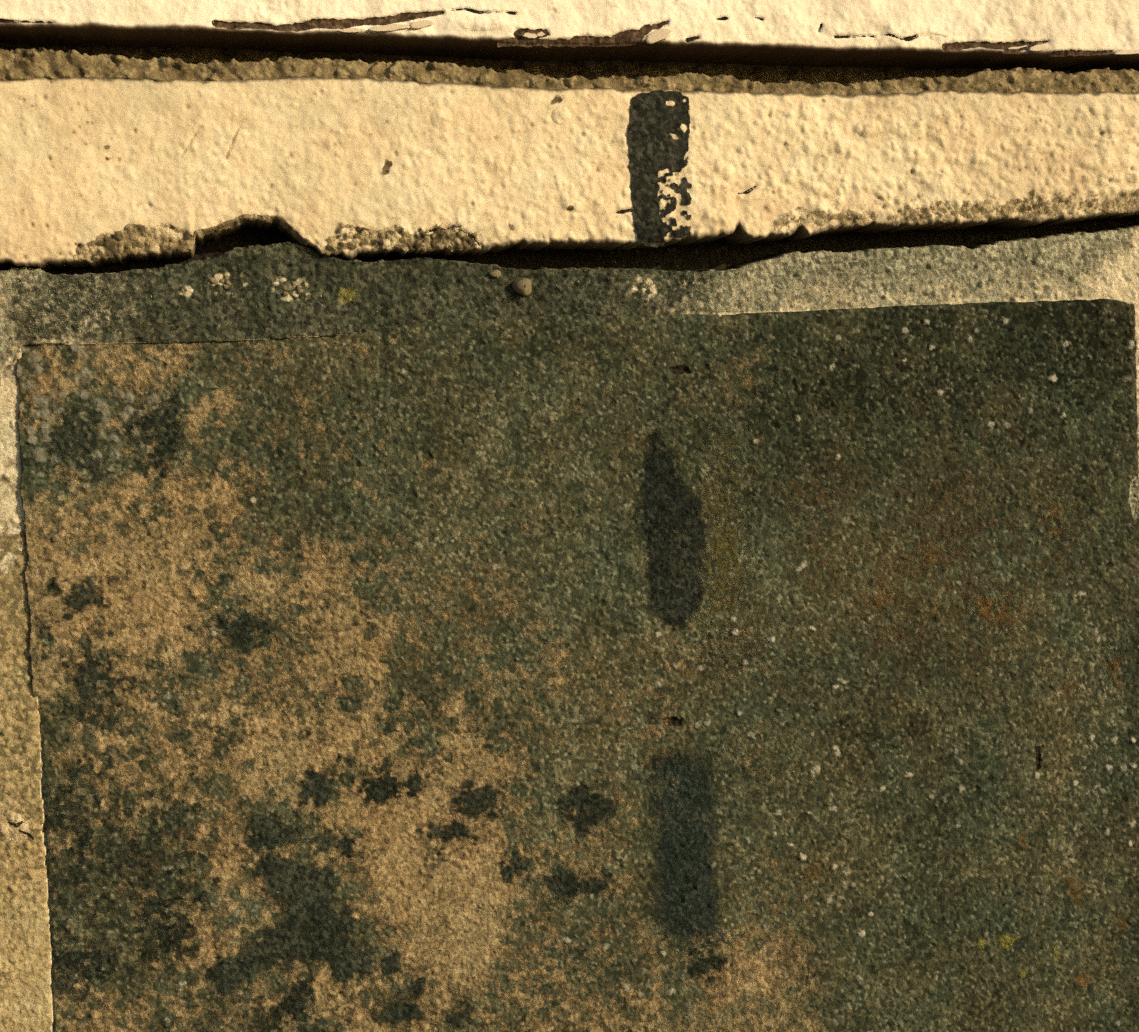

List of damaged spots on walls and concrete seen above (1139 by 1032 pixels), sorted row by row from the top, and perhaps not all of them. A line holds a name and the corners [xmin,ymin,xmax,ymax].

crack [0,16,53,24]
peeling [212,11,444,33]
peeling [497,20,674,48]
crack [686,16,728,42]
crack [818,24,945,41]
crack [615,207,633,215]
crack [0,227,292,275]
spalling [74,214,478,263]
crack [328,225,484,262]
damp [0,226,1139,1032]